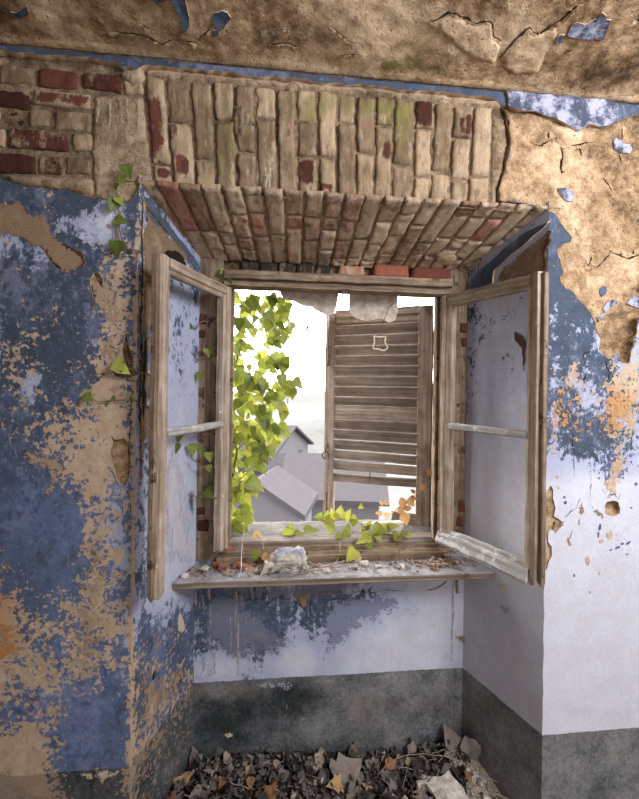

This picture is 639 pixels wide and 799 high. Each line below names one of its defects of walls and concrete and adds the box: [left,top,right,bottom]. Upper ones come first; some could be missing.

peeling [154,0,189,32]
crack [427,0,586,58]
crack [629,18,639,28]
crack [530,133,596,173]
flaking render [0,49,639,363]
crack [543,224,639,296]
peeling [102,204,189,486]
flaking render [514,332,526,371]
flaking render [579,453,623,525]
flaking render [197,507,209,532]
water stain [225,583,369,667]
peeling [82,769,124,784]